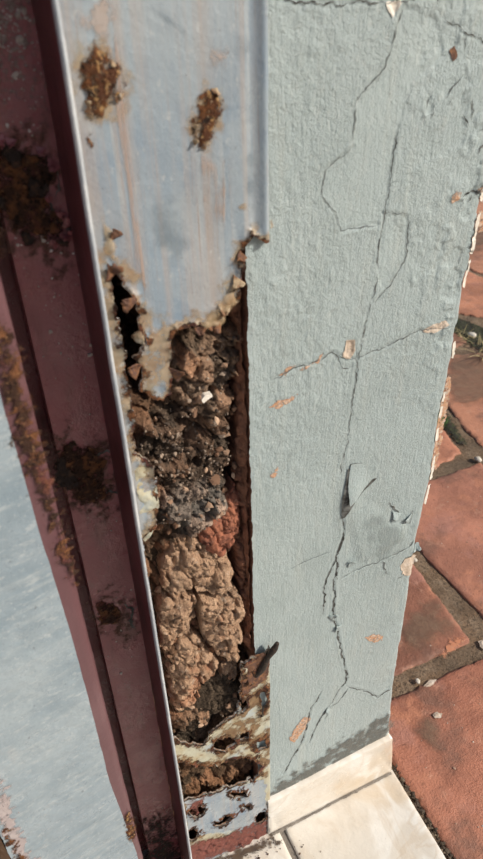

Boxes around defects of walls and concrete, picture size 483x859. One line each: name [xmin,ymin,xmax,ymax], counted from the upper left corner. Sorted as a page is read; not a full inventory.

crack [437,0,483,56]
rust [74,0,273,545]
crack [275,0,448,472]
crack [451,186,482,206]
peeling [0,780,41,859]
rust [0,323,120,585]
rust [86,585,140,648]
spalling [150,680,198,849]
spalling [111,274,254,816]
rust [124,641,279,859]
crack [283,519,414,775]